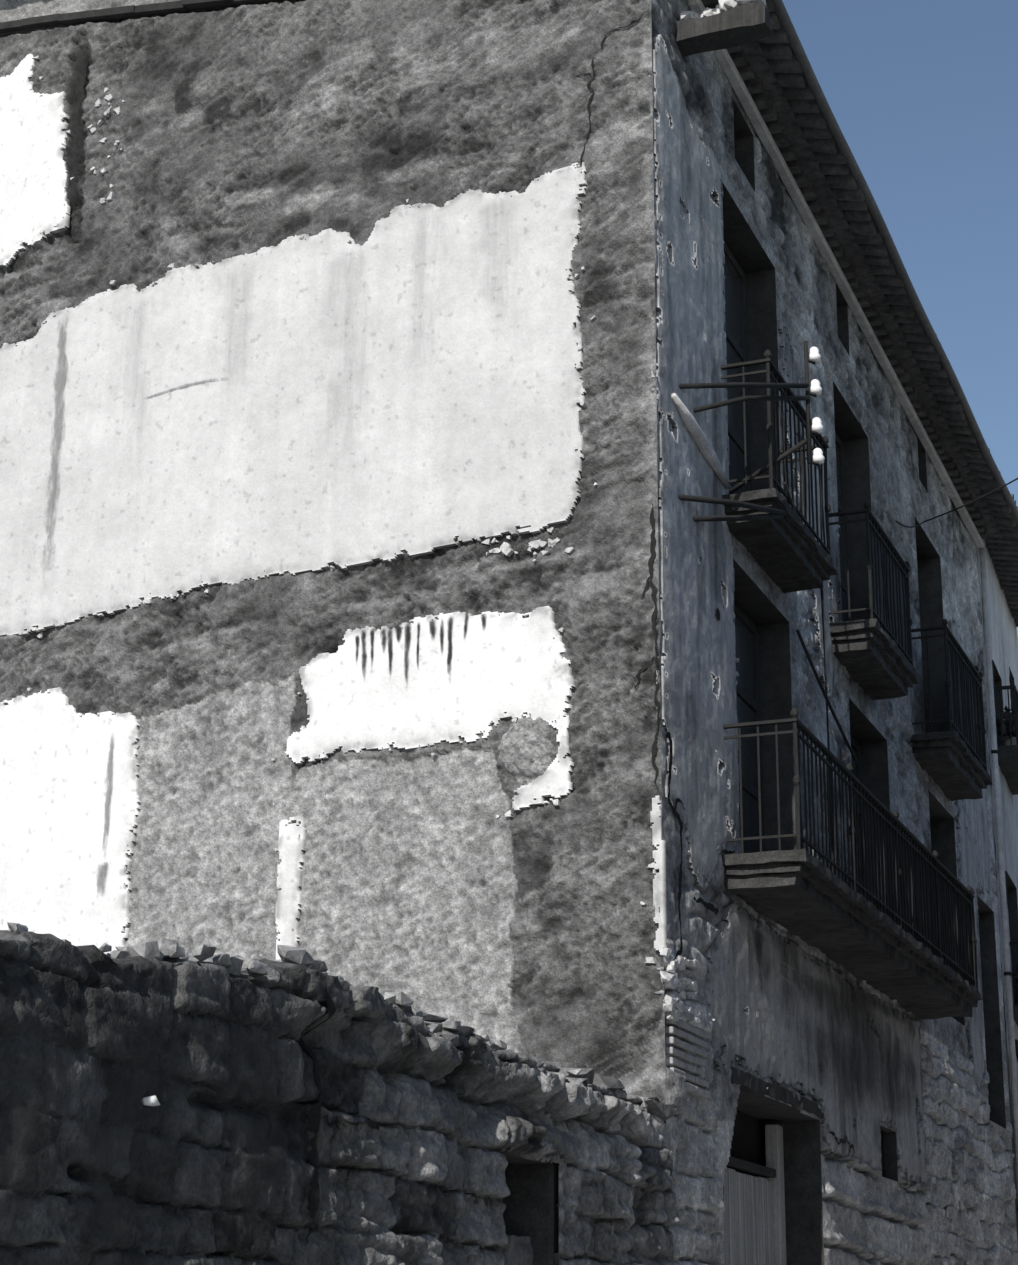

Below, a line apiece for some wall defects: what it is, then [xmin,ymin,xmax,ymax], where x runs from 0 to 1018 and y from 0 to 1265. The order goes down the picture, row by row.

peeling [0,54,126,267]
water stain [65,45,89,205]
crack [578,10,649,167]
water stain [47,327,66,542]
peeling [0,162,598,639]
peeling [0,687,141,954]
water stain [97,862,107,892]
water stain [103,738,113,843]
peeling [275,816,306,960]
water stain [355,613,485,678]
peeling [271,606,575,818]
peeling [640,34,926,1191]